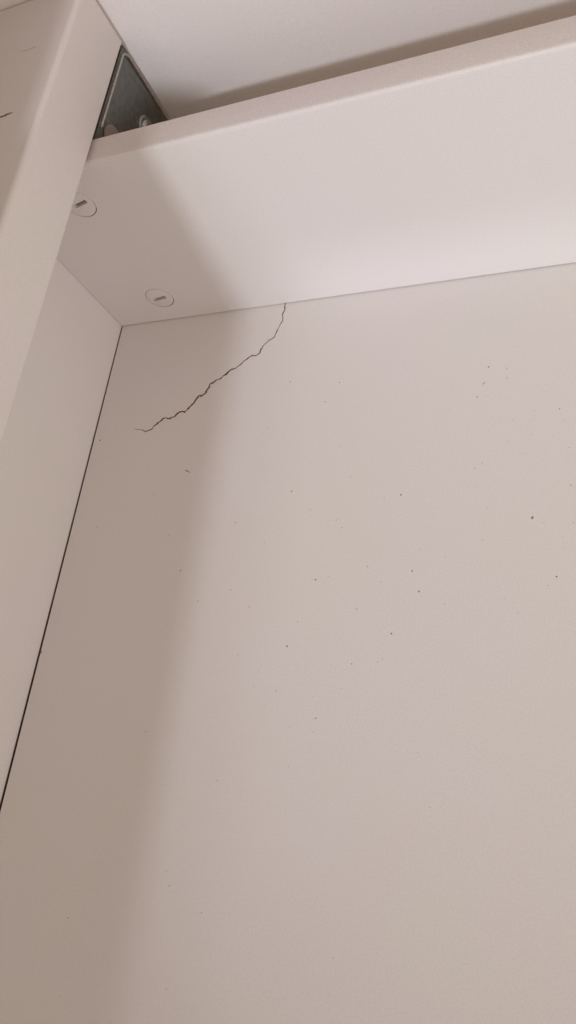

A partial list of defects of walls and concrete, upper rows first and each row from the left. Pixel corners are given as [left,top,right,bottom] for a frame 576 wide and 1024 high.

crack [135,303,286,432]